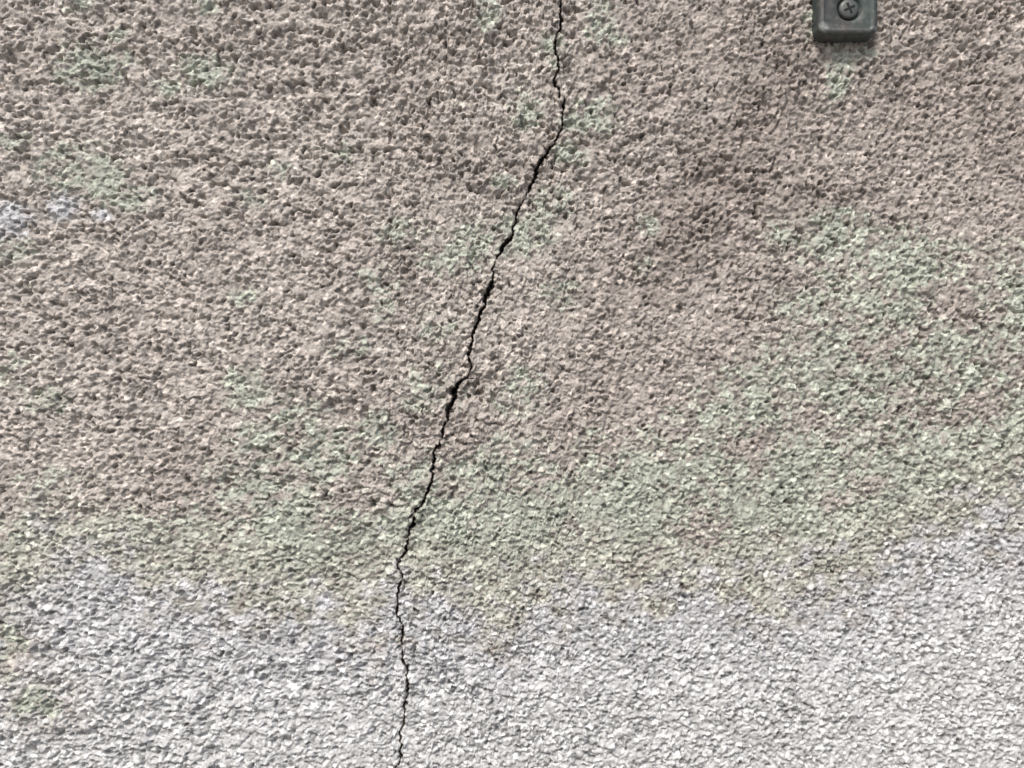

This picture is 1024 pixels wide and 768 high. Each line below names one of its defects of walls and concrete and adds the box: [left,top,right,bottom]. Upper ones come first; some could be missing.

crack [395,0,565,768]